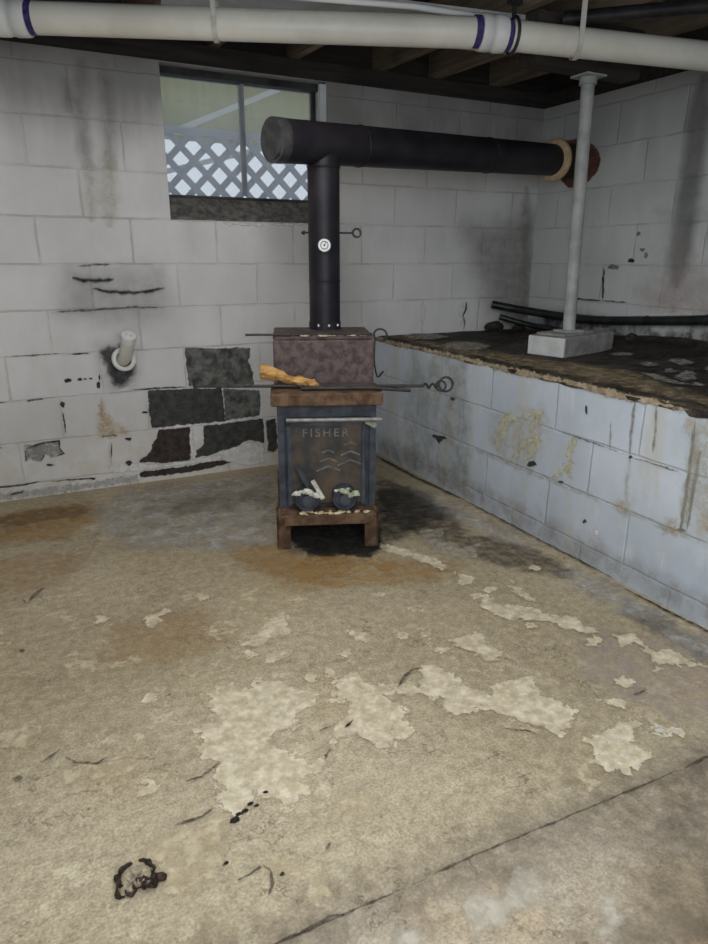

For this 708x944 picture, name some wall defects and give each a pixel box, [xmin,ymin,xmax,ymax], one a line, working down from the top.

peeling [24,401,66,462]
peeling [125,347,278,477]
peeling [496,410,542,467]
peeling [377,336,708,413]
peeling [204,588,308,664]
crack [42,750,105,765]
peeling [143,628,580,907]
peeling [572,675,686,792]
crack [177,808,213,824]
crack [238,865,274,894]
crack [274,756,708,944]